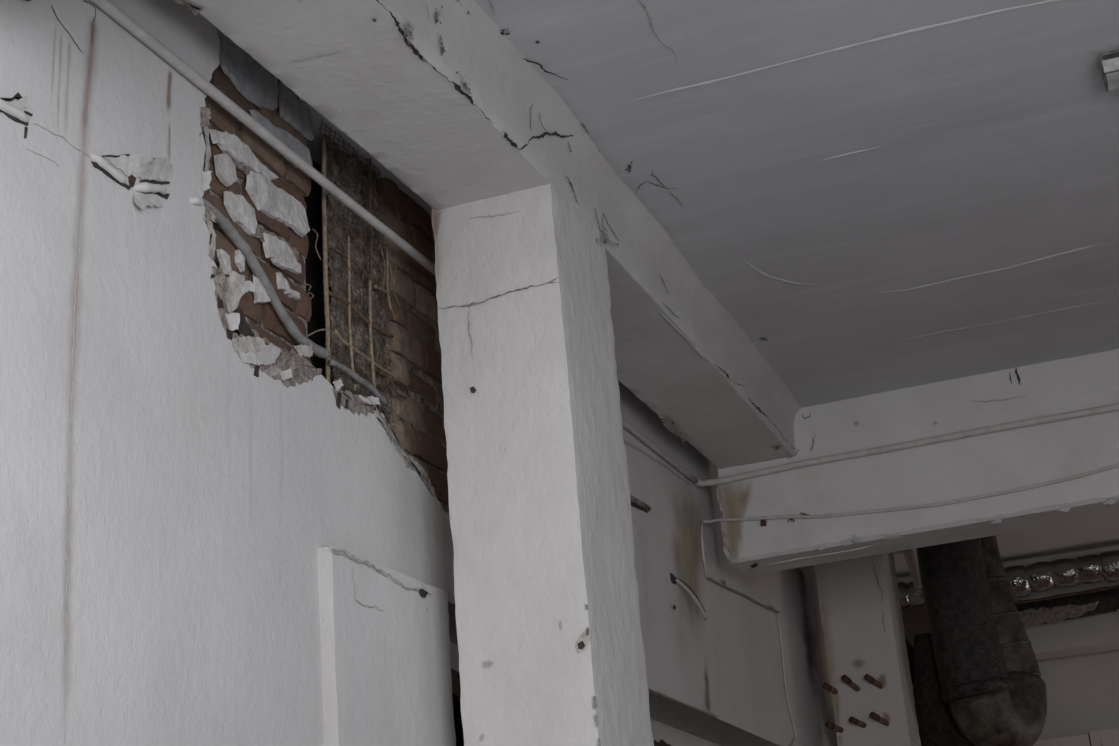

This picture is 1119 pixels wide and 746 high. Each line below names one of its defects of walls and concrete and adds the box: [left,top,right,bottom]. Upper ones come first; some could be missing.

crack [637,0,678,62]
spalling [0,93,33,139]
crack [376,0,619,240]
spalling [90,153,173,210]
crack [637,170,680,203]
spalling [190,27,449,513]
crack [438,277,561,357]
crack [972,368,1024,402]
crack [322,545,432,612]